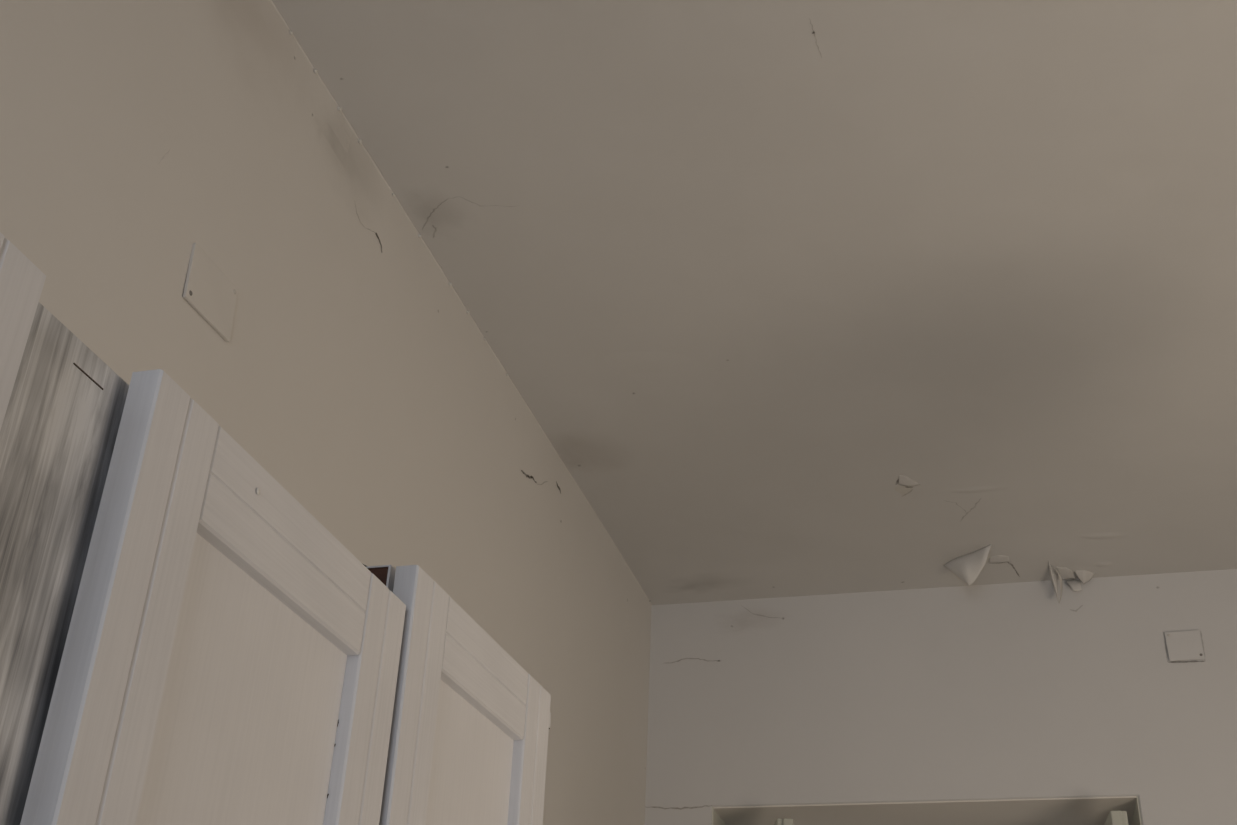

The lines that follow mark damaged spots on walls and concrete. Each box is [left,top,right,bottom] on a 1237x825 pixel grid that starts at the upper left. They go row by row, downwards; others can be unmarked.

peeling [944,545,1010,586]